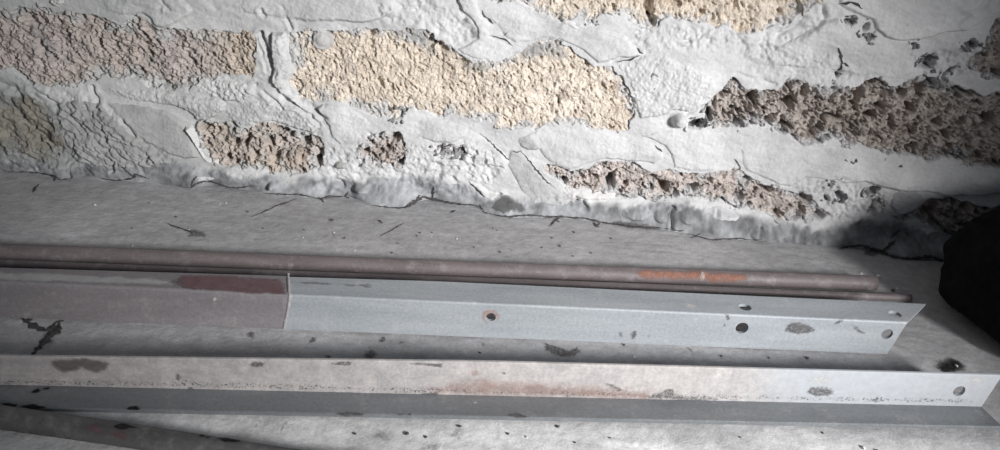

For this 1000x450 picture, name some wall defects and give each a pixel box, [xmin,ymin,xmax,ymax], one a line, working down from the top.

spalling [684,112,709,132]
peeling [185,125,220,164]
crack [183,176,349,216]
peeling [564,185,616,201]
crack [373,184,761,241]
peeling [706,206,739,221]
crack [839,230,944,261]